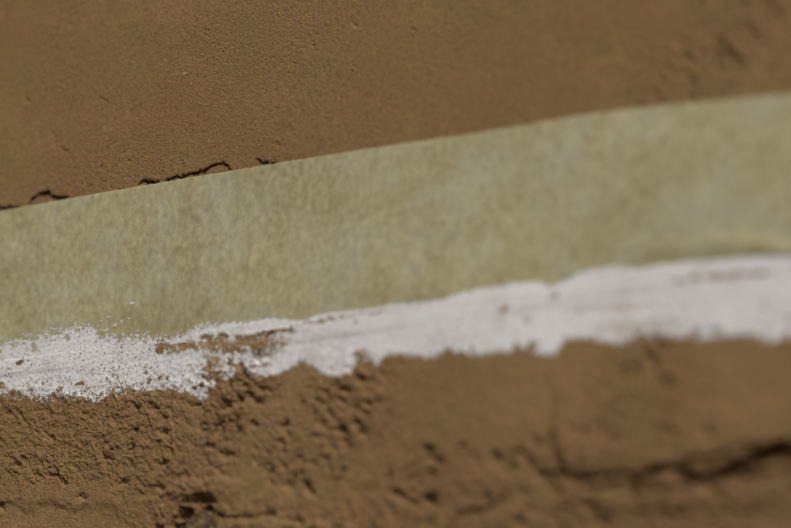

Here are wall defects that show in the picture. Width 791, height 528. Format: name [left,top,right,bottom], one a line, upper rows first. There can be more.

crack [138,160,232,185]
crack [255,157,277,165]
crack [0,189,70,211]
spalling [0,297,791,528]
crack [538,372,791,492]